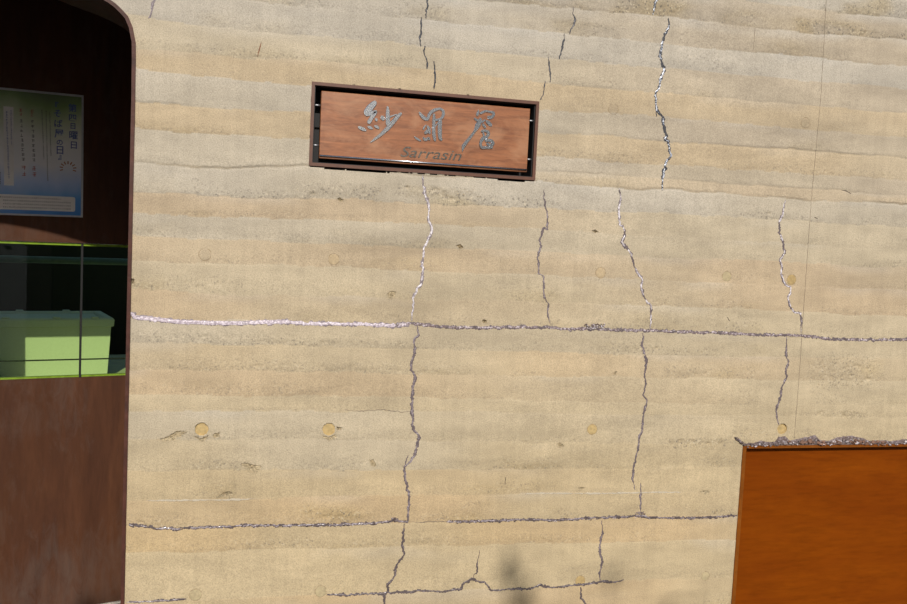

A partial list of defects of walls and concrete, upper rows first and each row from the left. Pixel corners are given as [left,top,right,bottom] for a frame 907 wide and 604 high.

crack [419,0,436,89]
crack [540,8,576,100]
crack [652,0,672,190]
crack [127,175,907,604]